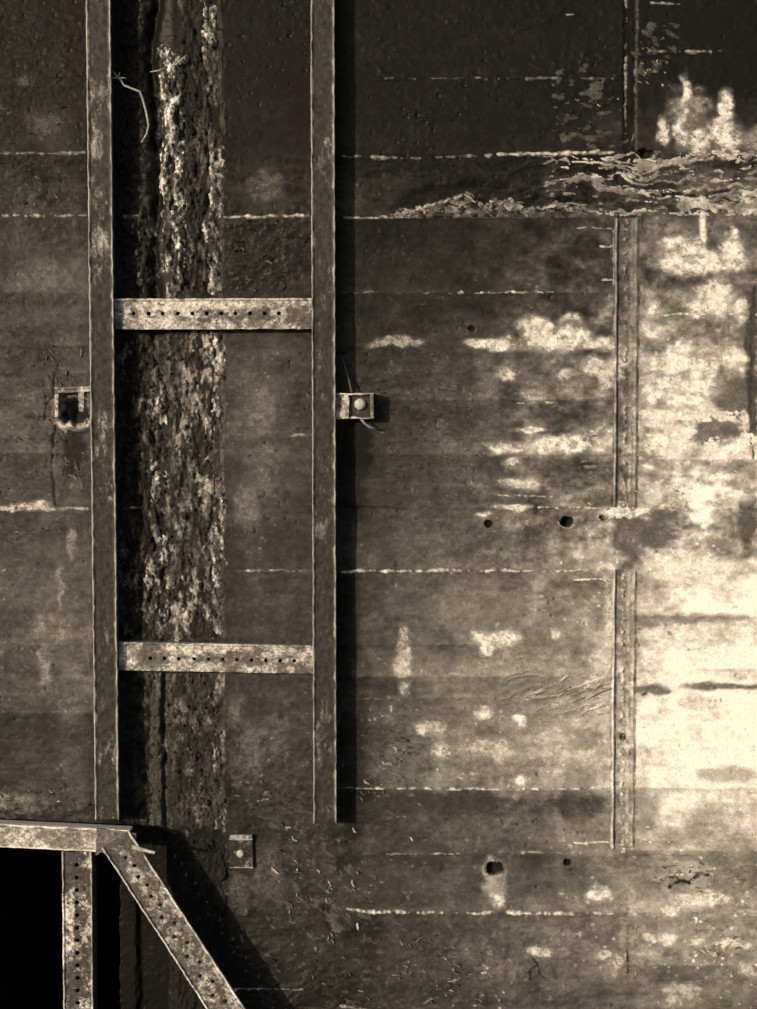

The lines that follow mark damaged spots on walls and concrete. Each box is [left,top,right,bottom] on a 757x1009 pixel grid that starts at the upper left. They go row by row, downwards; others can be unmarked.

spalling [391,63,757,218]
damp [658,81,757,152]
damp [370,336,422,348]
damp [468,339,513,351]
damp [519,313,629,390]
damp [641,213,757,459]
crack [43,364,59,506]
damp [521,426,591,455]
damp [603,489,736,578]
spalling [489,666,617,718]
damp [634,685,671,695]
damp [685,682,757,691]